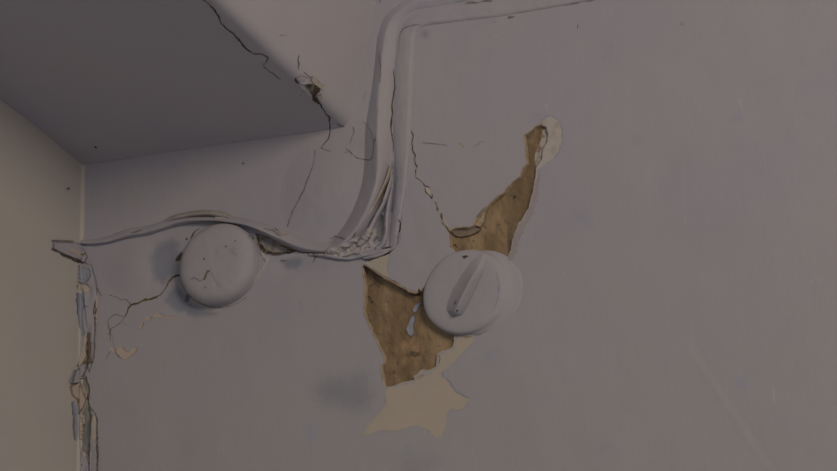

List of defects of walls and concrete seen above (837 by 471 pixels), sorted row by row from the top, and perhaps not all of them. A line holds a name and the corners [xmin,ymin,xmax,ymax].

crack [203,0,281,80]
crack [456,0,514,23]
crack [258,56,484,262]
spalling [450,115,563,259]
peeling [51,240,102,471]
crack [108,253,181,348]
spalling [255,161,455,388]